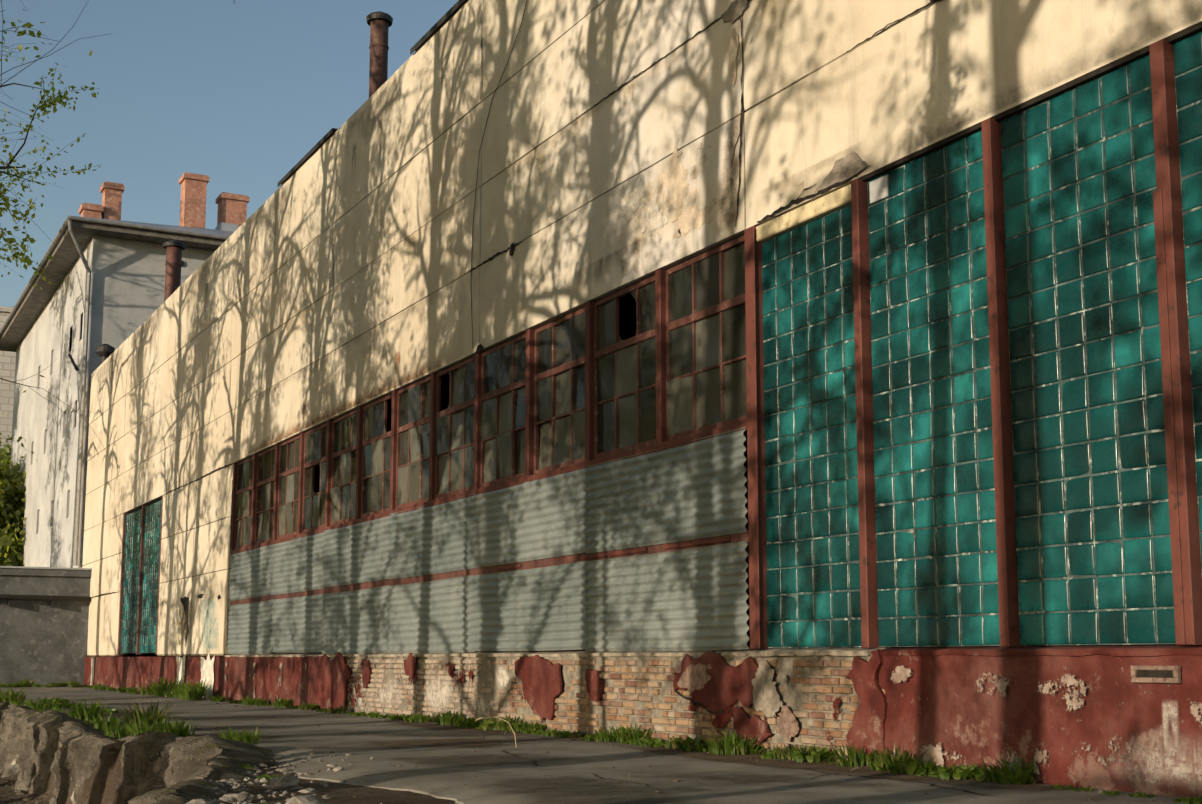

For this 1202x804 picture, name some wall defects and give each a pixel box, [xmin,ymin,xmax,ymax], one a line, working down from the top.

crack [477,11,485,100]
peeling [721,0,748,87]
crack [846,1,934,52]
crack [566,0,856,227]
peeling [613,142,719,238]
spalling [814,150,869,194]
crack [464,241,522,275]
spalling [674,661,712,693]
spalling [752,660,799,750]
peeling [891,666,911,684]
peeling [975,672,1010,698]
peeling [1038,672,1087,712]